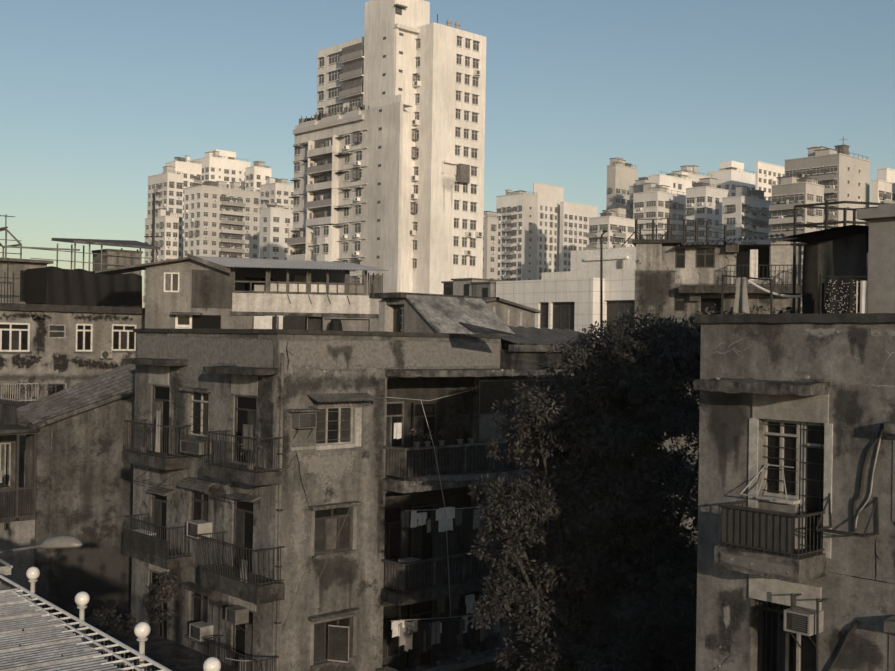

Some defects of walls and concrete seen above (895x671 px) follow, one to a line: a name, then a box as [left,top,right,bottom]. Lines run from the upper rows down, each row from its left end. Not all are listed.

damp [329,347,351,361]
damp [710,395,745,452]
damp [834,385,862,424]
damp [830,620,882,669]